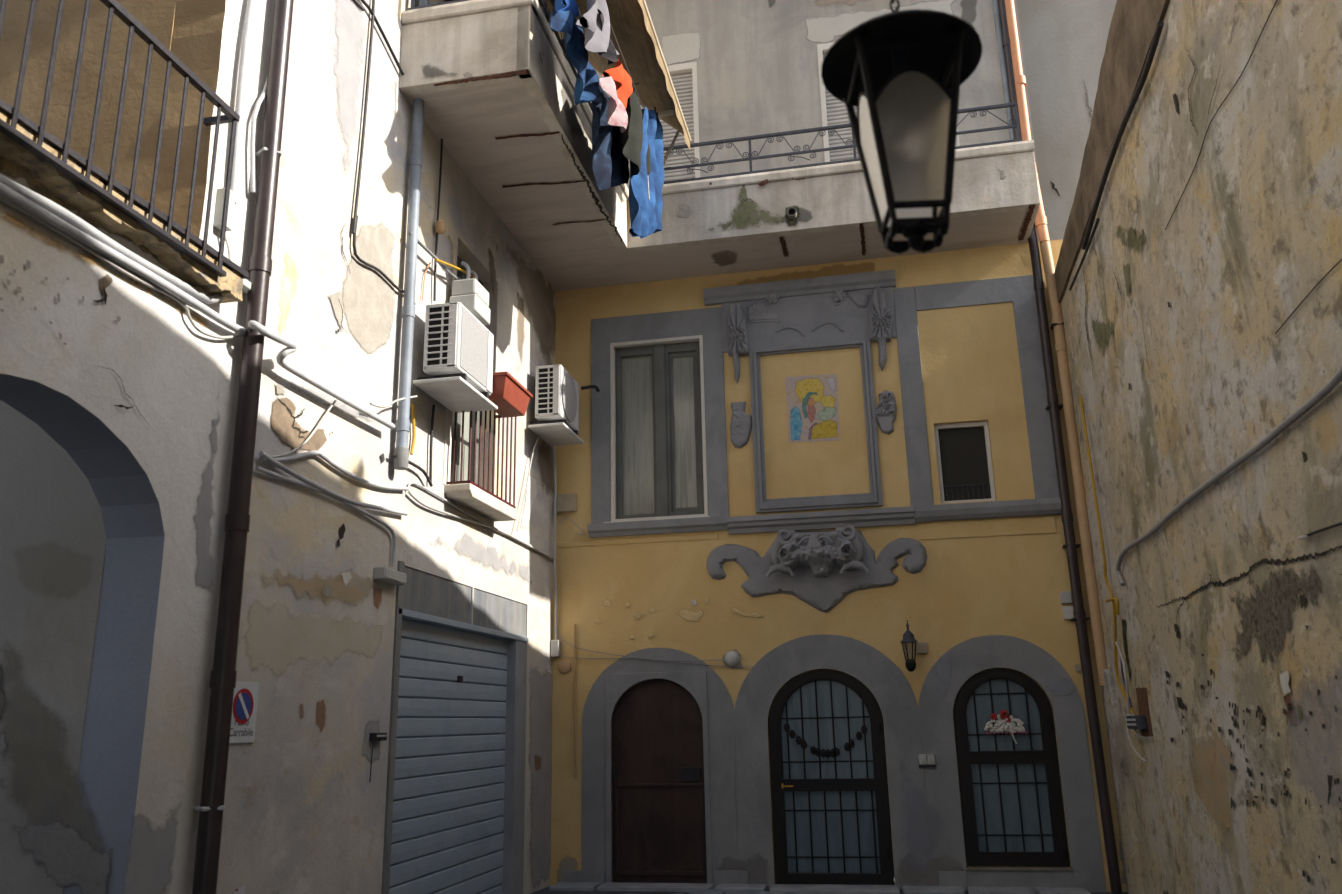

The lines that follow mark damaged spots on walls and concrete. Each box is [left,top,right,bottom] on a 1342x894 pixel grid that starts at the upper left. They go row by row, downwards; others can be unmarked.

spalling [82,274,113,306]
peeling [329,223,395,354]
spalling [271,383,333,451]
peeling [263,570,373,603]
crack [1156,545,1342,618]